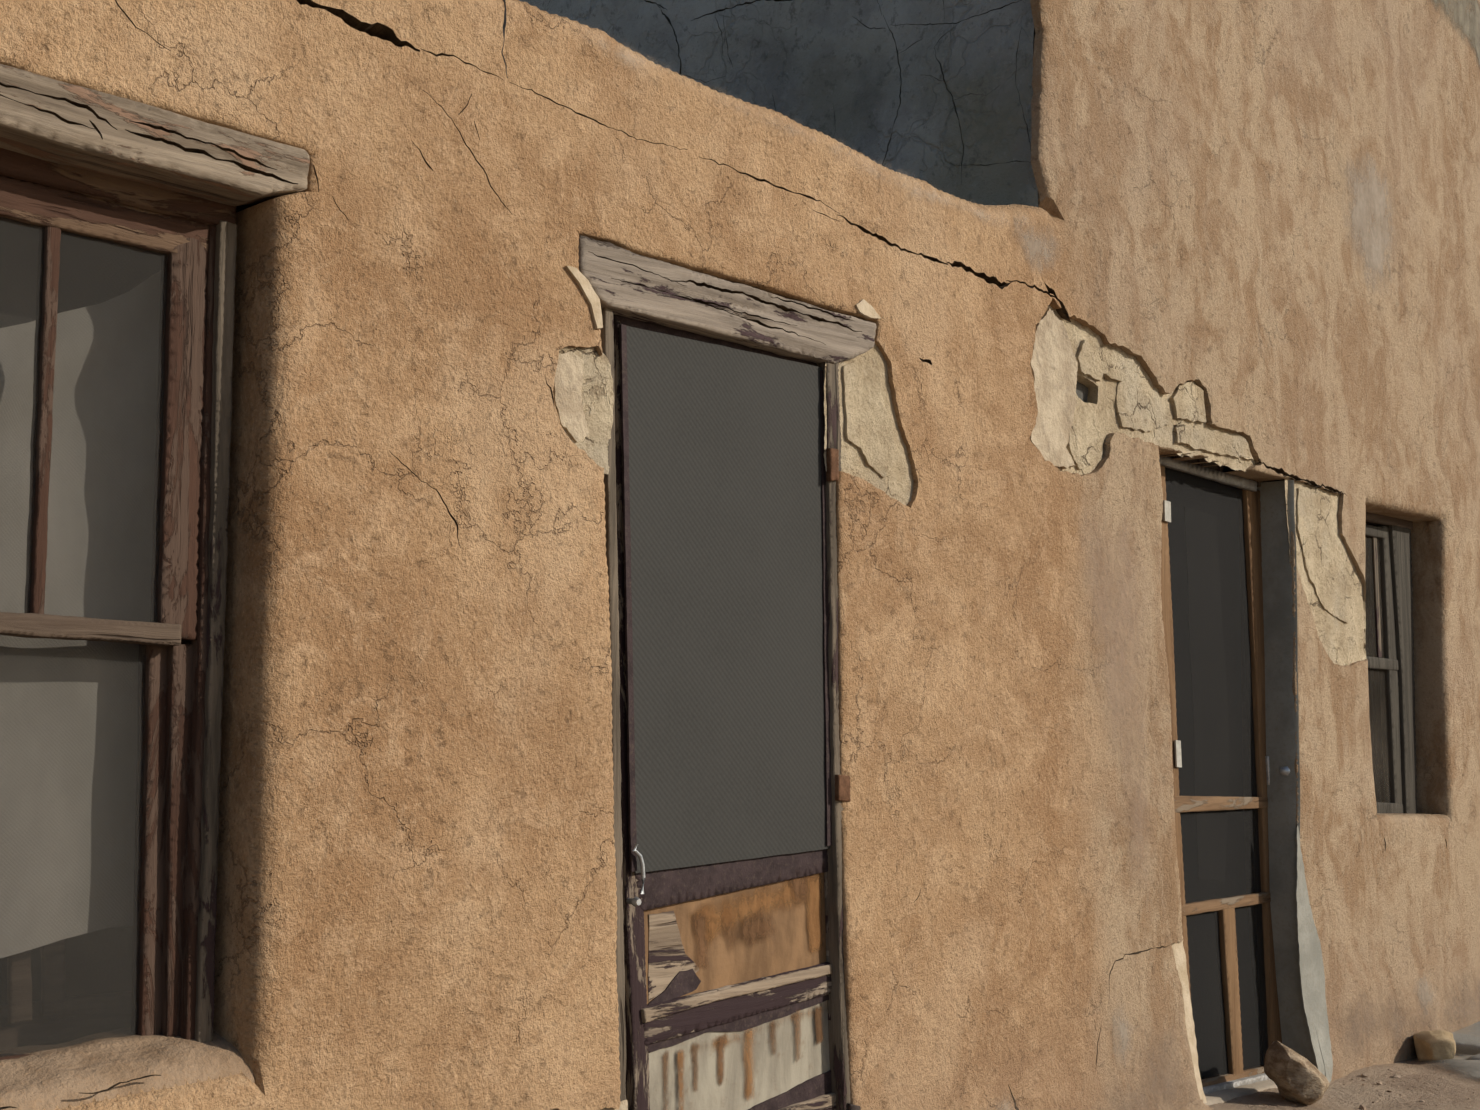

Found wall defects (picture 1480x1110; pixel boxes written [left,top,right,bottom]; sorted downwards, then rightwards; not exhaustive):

crack [115,0,170,51]
crack [297,0,1071,322]
peeling [565,266,603,329]
peeling [855,299,881,319]
peeling [553,346,614,474]
peeling [824,344,913,506]
peeling [1029,305,1257,475]
peeling [1284,475,1366,666]
crack [78,1075,161,1094]
peeling [600,1100,628,1110]